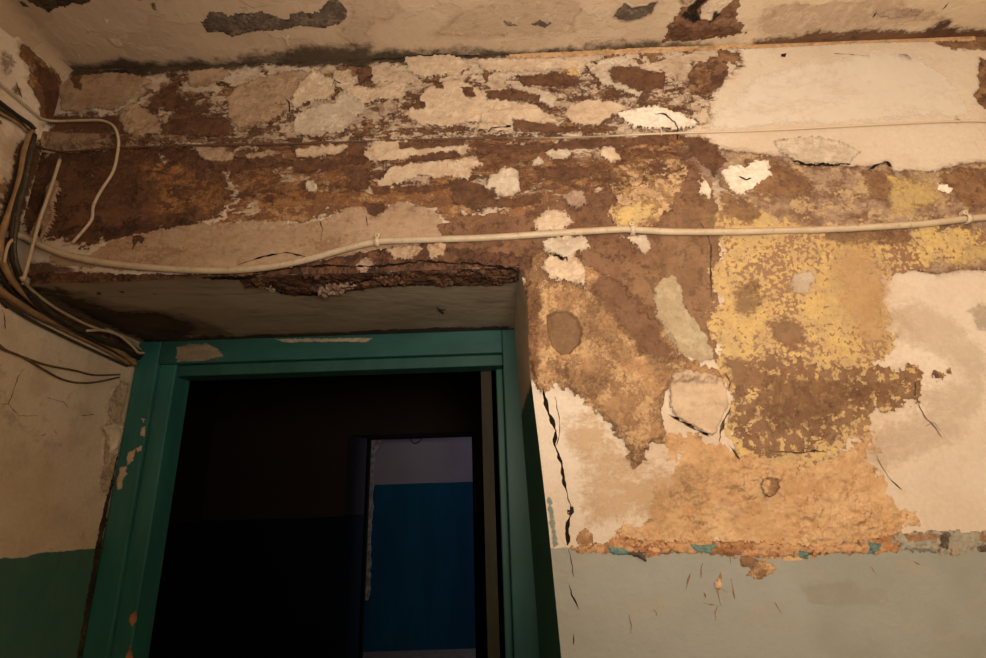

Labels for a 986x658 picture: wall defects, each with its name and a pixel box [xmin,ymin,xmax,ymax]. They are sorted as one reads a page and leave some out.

spalling [20,0,91,13]
peeling [661,0,950,43]
peeling [27,47,986,580]
crack [668,373,740,460]
crack [538,390,579,609]